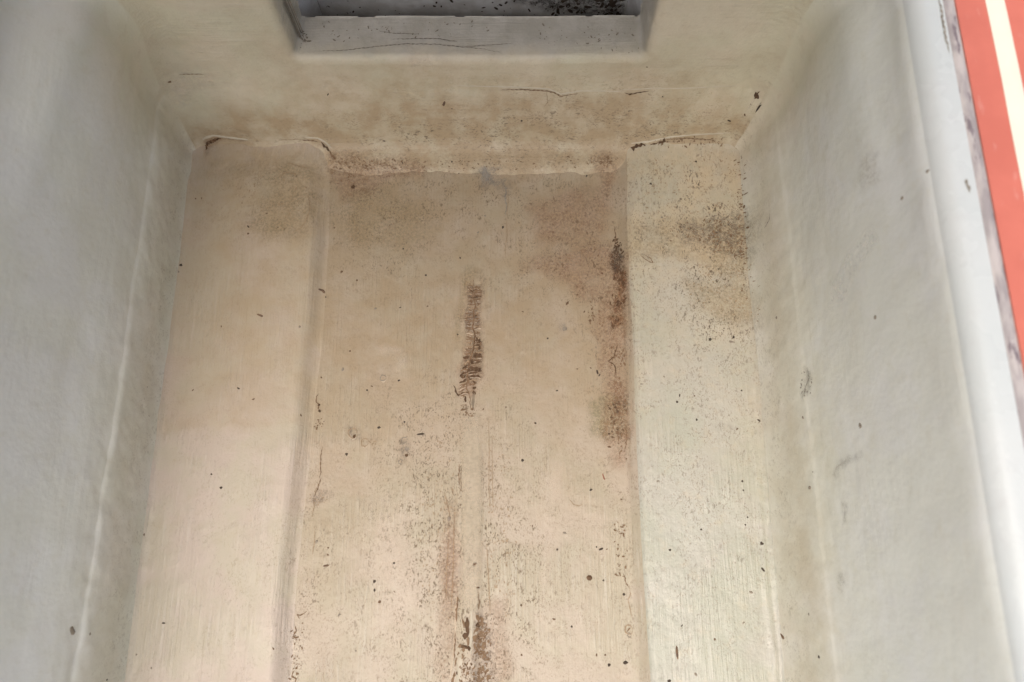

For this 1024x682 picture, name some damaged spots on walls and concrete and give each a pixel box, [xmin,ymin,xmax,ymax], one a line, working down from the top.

crack [455,85,747,106]
leakage [638,148,760,315]